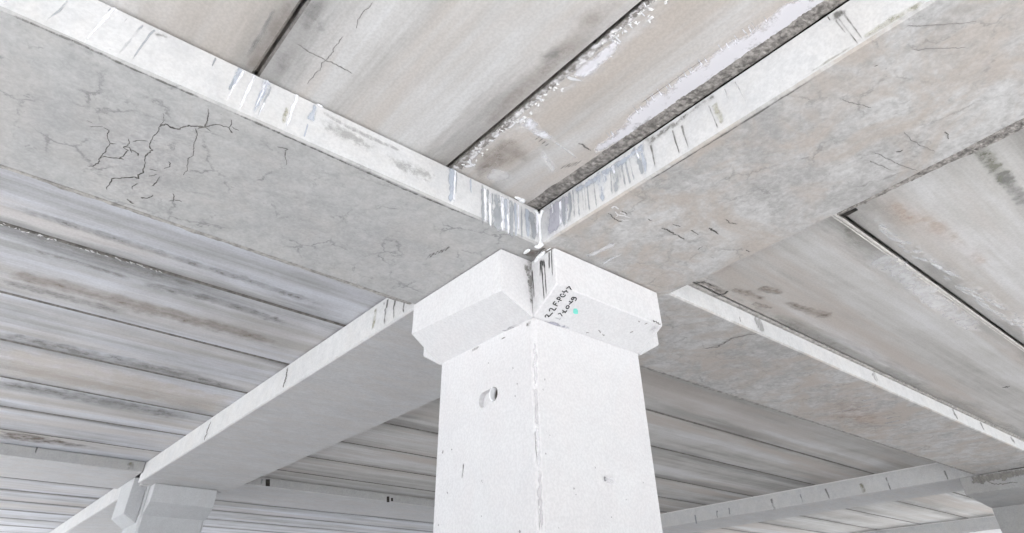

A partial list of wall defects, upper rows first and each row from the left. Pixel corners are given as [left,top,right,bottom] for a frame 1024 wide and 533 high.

crack [297,2,373,84]
water stain [229,69,271,113]
crack [88,112,239,204]
water stain [449,0,668,296]